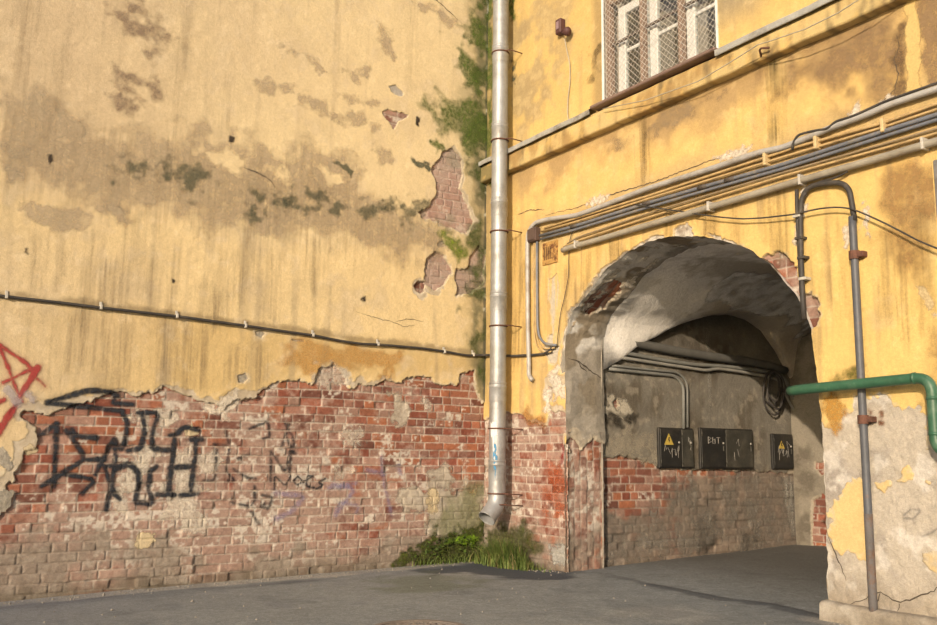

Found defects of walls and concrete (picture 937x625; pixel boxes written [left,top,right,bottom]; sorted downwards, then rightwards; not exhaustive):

damp [118,5,168,39]
crack [883,35,899,101]
peeling [298,96,376,131]
spalling [367,100,420,129]
spalling [716,145,751,160]
flaking render [419,149,473,234]
spalling [586,194,610,207]
flaking render [414,241,486,295]
peeling [706,252,821,338]
flaking render [0,363,796,602]
flaking render [812,392,937,617]
crack [852,587,937,611]